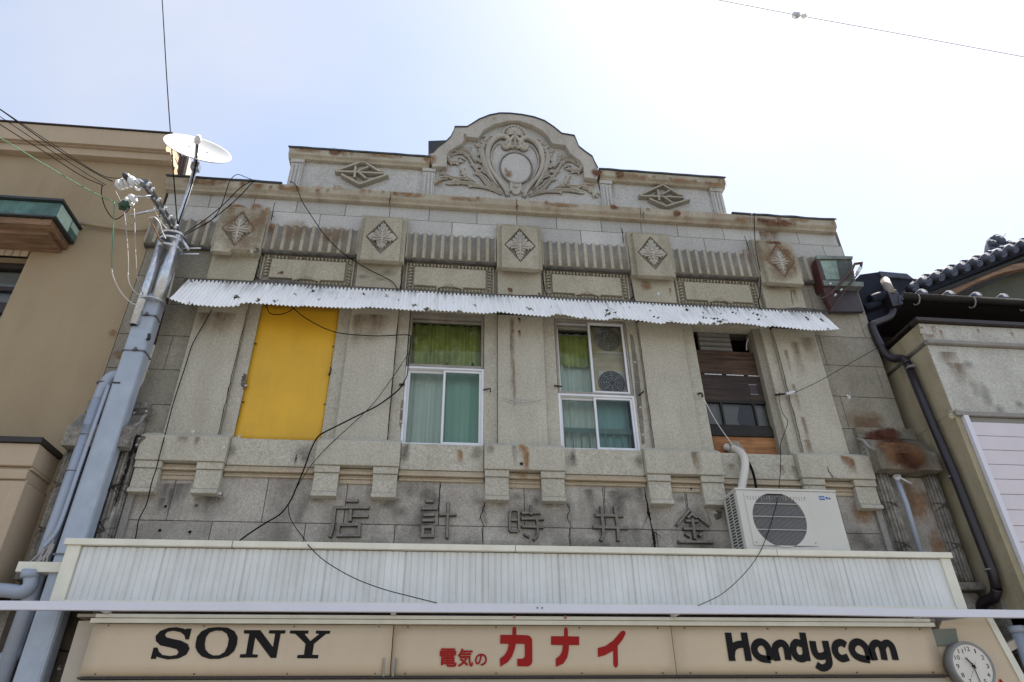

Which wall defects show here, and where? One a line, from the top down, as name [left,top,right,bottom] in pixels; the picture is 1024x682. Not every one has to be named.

corrosion [737,217,807,257]
corrosion [856,416,925,469]
crack [642,488,661,548]